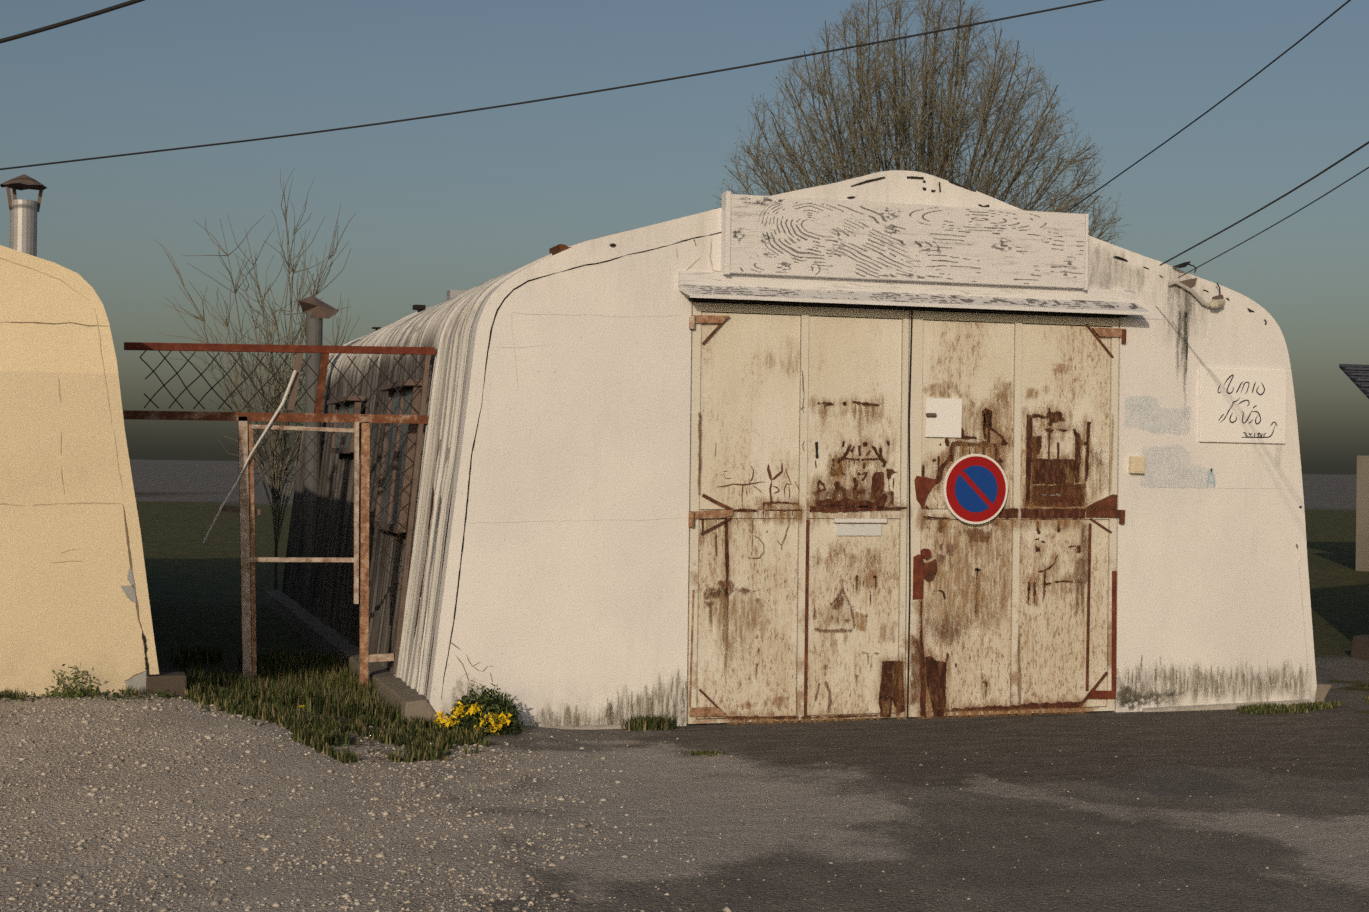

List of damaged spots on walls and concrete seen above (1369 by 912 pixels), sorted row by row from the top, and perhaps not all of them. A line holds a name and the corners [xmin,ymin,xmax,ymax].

peeling [693,176,1138,309]
damp [1177,289,1191,379]
crack [0,258,143,632]
rust [812,400,883,417]
rust [922,385,1008,487]
rust [699,408,1113,724]
damp [1120,657,1303,708]